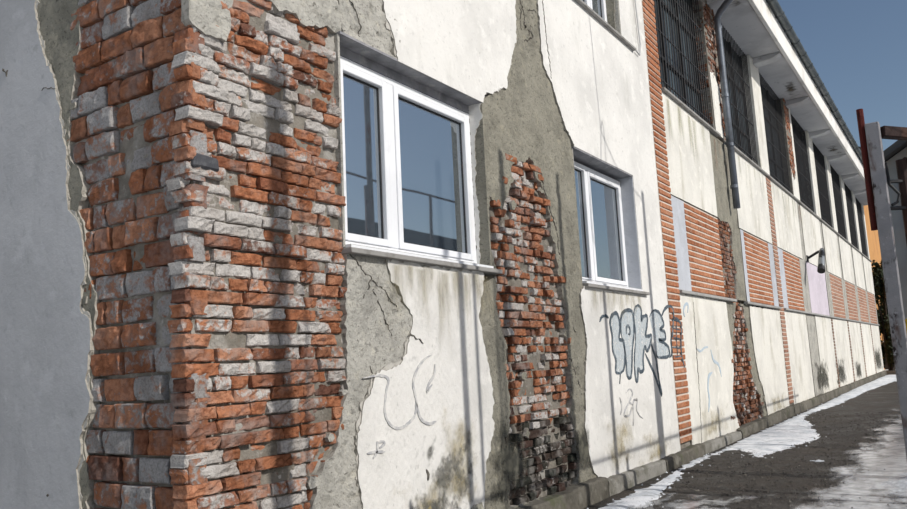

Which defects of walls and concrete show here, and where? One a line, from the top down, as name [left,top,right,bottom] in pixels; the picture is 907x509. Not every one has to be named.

spalling [37,0,412,509]
crack [337,0,362,37]
spalling [469,0,597,509]
crack [519,0,552,79]
spalling [693,0,767,426]
damp [412,437,472,509]